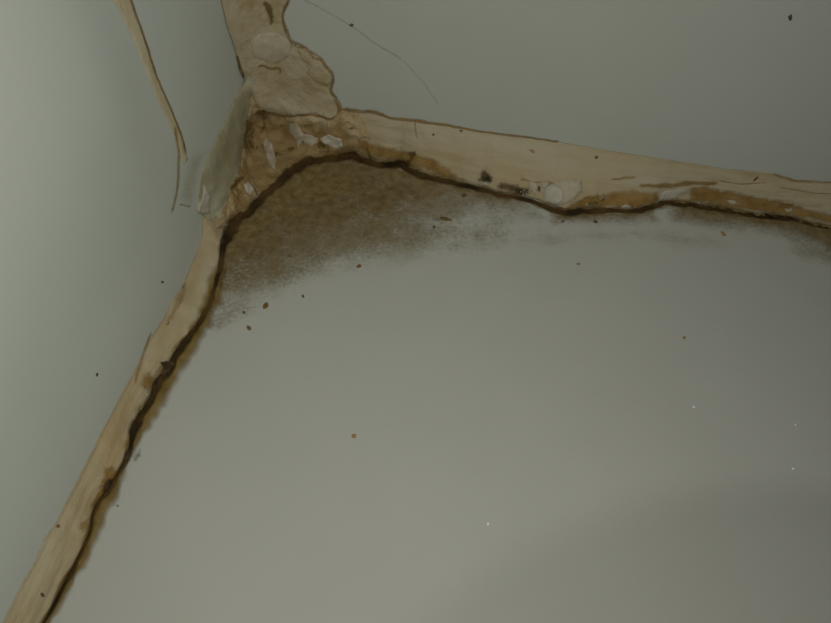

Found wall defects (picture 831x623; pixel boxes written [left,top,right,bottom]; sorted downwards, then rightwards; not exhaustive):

peeling [288,123,343,149]
peeling [263,137,276,169]
peeling [520,179,582,206]
peeling [660,189,687,201]
damp [219,160,528,290]
damp [673,200,831,248]
crack [42,123,831,623]